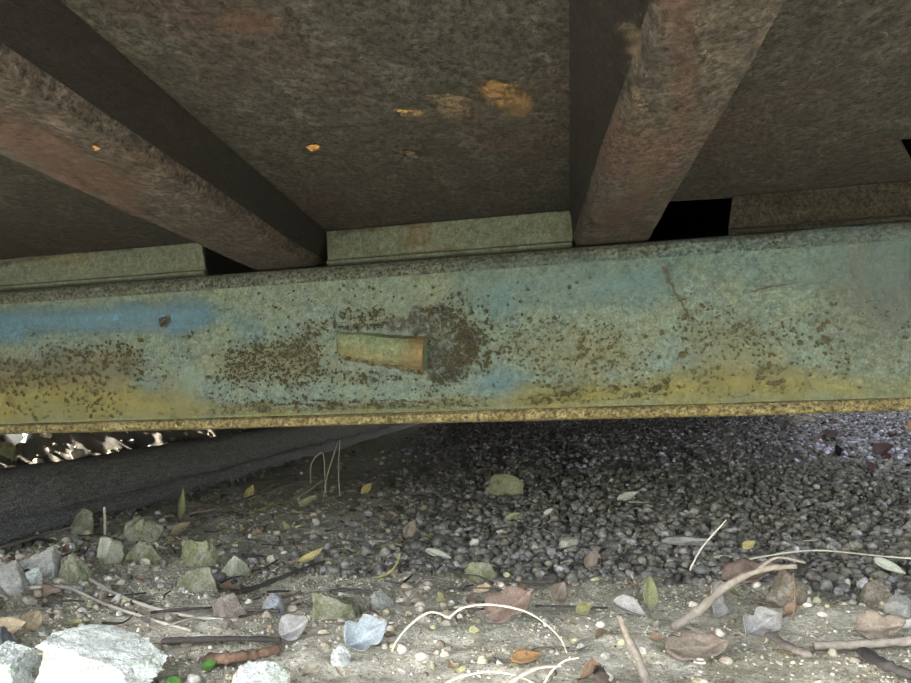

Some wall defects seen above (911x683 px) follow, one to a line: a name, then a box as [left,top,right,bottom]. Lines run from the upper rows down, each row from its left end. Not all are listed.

rust [205,319,338,389]
rust [340,286,530,409]
rust [278,396,403,413]